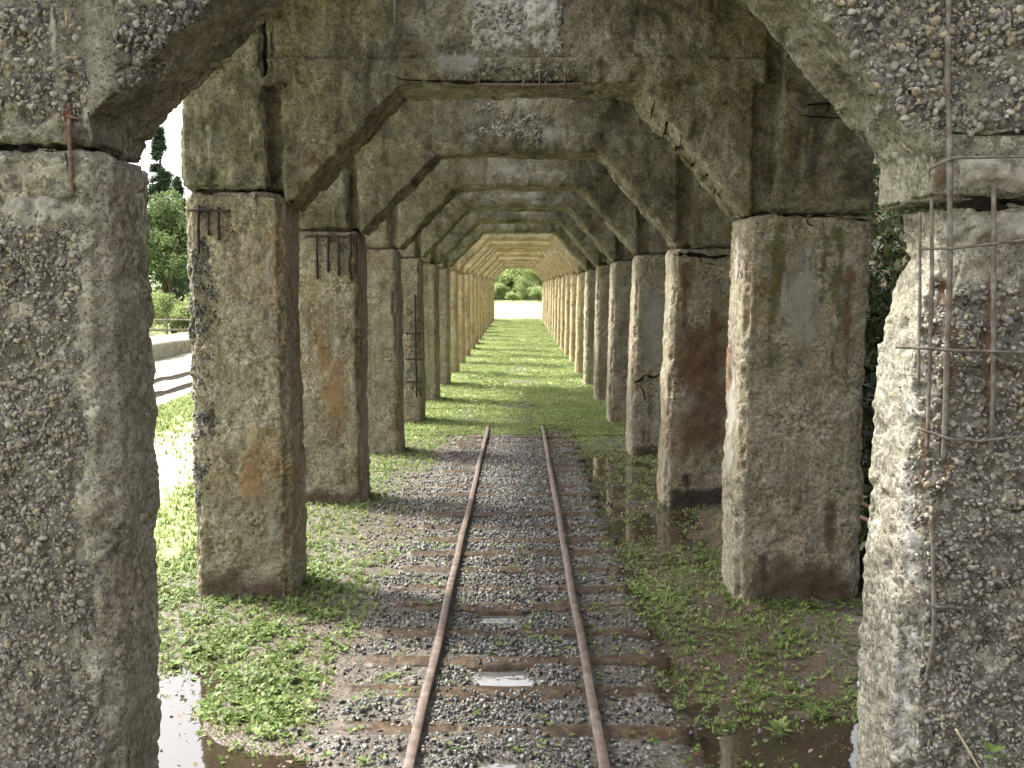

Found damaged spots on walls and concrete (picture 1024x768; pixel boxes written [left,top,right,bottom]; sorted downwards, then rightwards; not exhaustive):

spalling [445,0,586,91]
crack [650,101,722,197]
crack [673,252,731,265]
leakage [781,228,844,330]
crack [633,374,659,399]
rust [680,263,732,453]
spalling [813,0,1024,768]